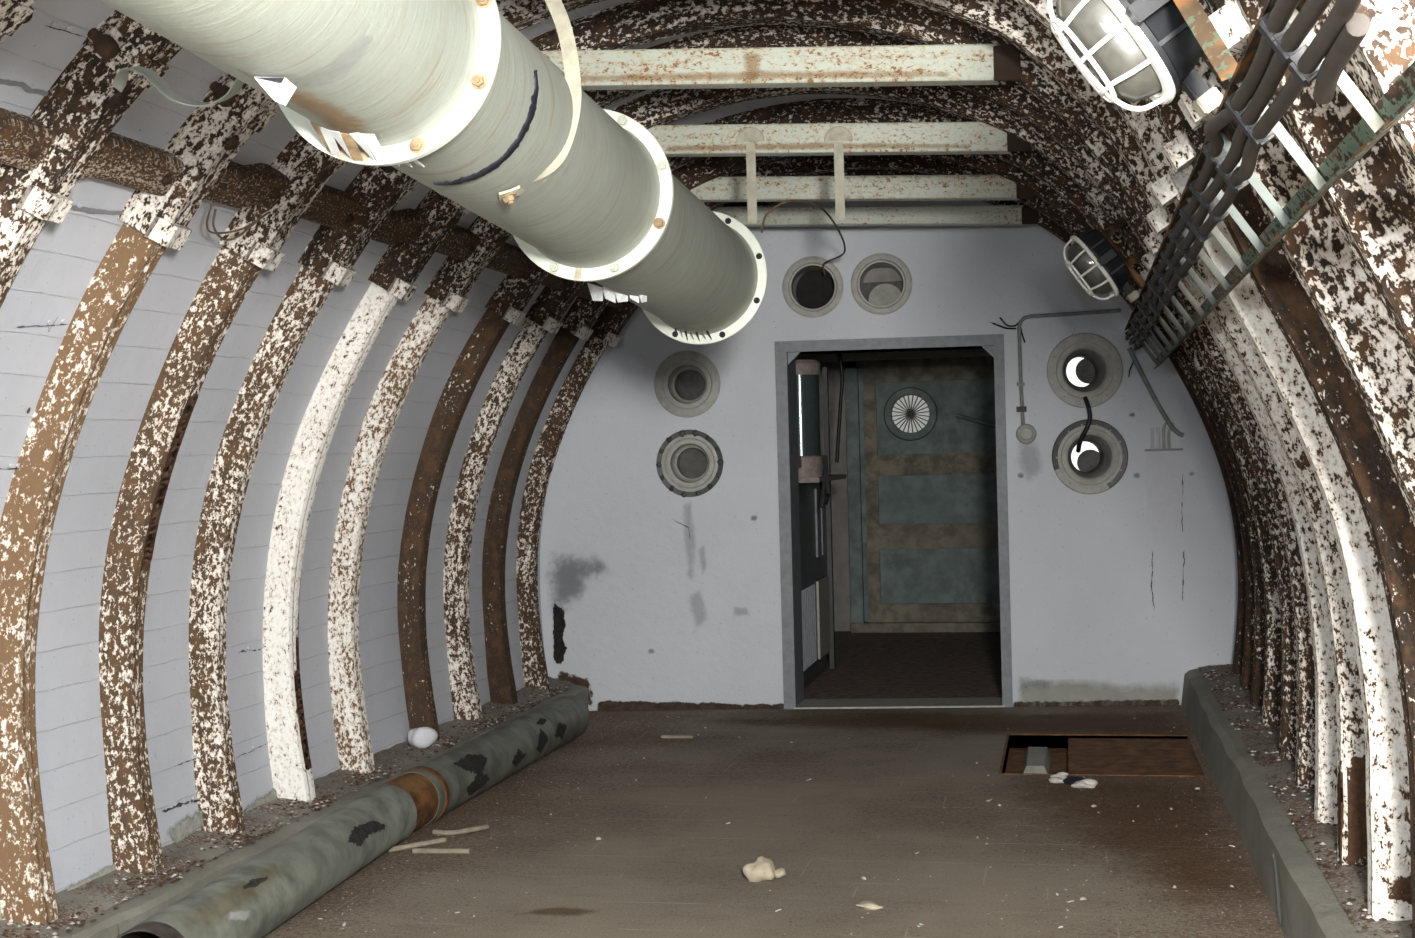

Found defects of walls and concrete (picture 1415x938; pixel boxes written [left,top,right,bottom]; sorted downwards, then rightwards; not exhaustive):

corrosion [141,395,198,568]
corrosion [1337,756,1368,867]
corrosion [1388,873,1412,905]